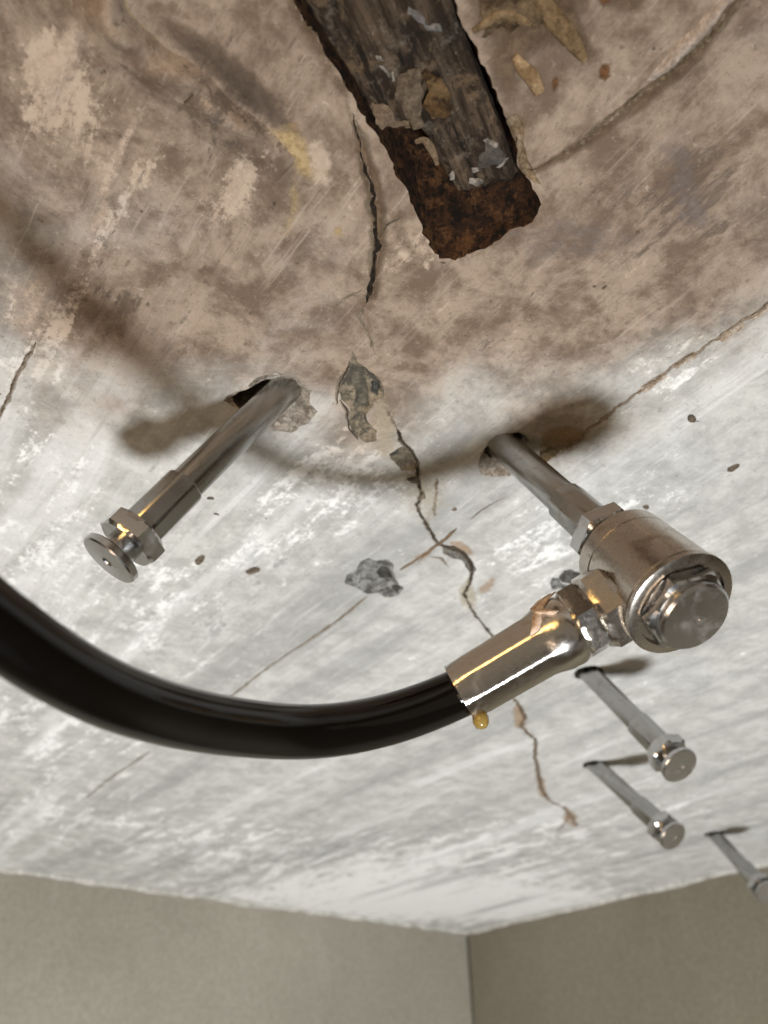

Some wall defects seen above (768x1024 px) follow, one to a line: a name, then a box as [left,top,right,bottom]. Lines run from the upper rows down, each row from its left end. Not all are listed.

damp [27,28,79,90]
damp [169,29,331,185]
spalling [293,0,541,260]
damp [474,0,555,95]
damp [536,0,738,171]
crack [331,114,401,350]
crack [0,341,37,418]
spalling [223,373,318,433]
spalling [335,350,386,443]
crack [555,302,768,457]
spalling [345,558,404,598]
crack [386,407,505,637]